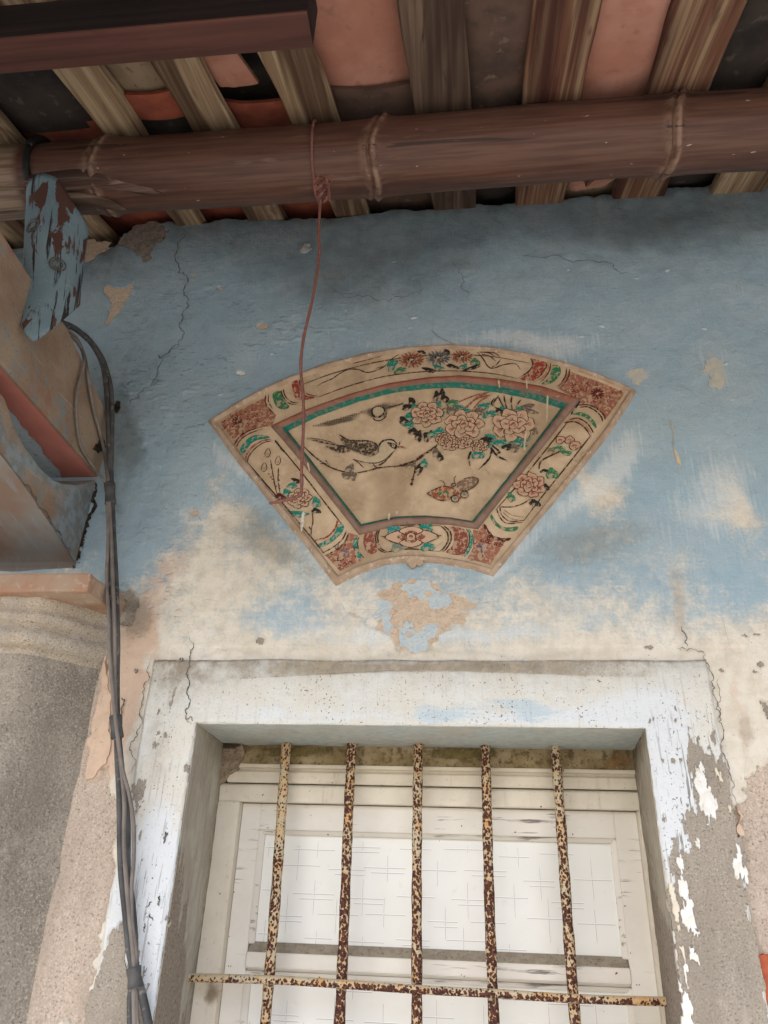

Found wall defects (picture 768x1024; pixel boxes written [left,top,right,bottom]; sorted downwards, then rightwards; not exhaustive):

peeling [103,284,135,325]
peeling [85,221,169,262]
crack [130,230,189,403]
crack [185,638,194,722]
peeling [349,578,477,653]
crack [680,626,737,803]
spalling [26,656,150,1024]
peeling [648,705,768,1024]